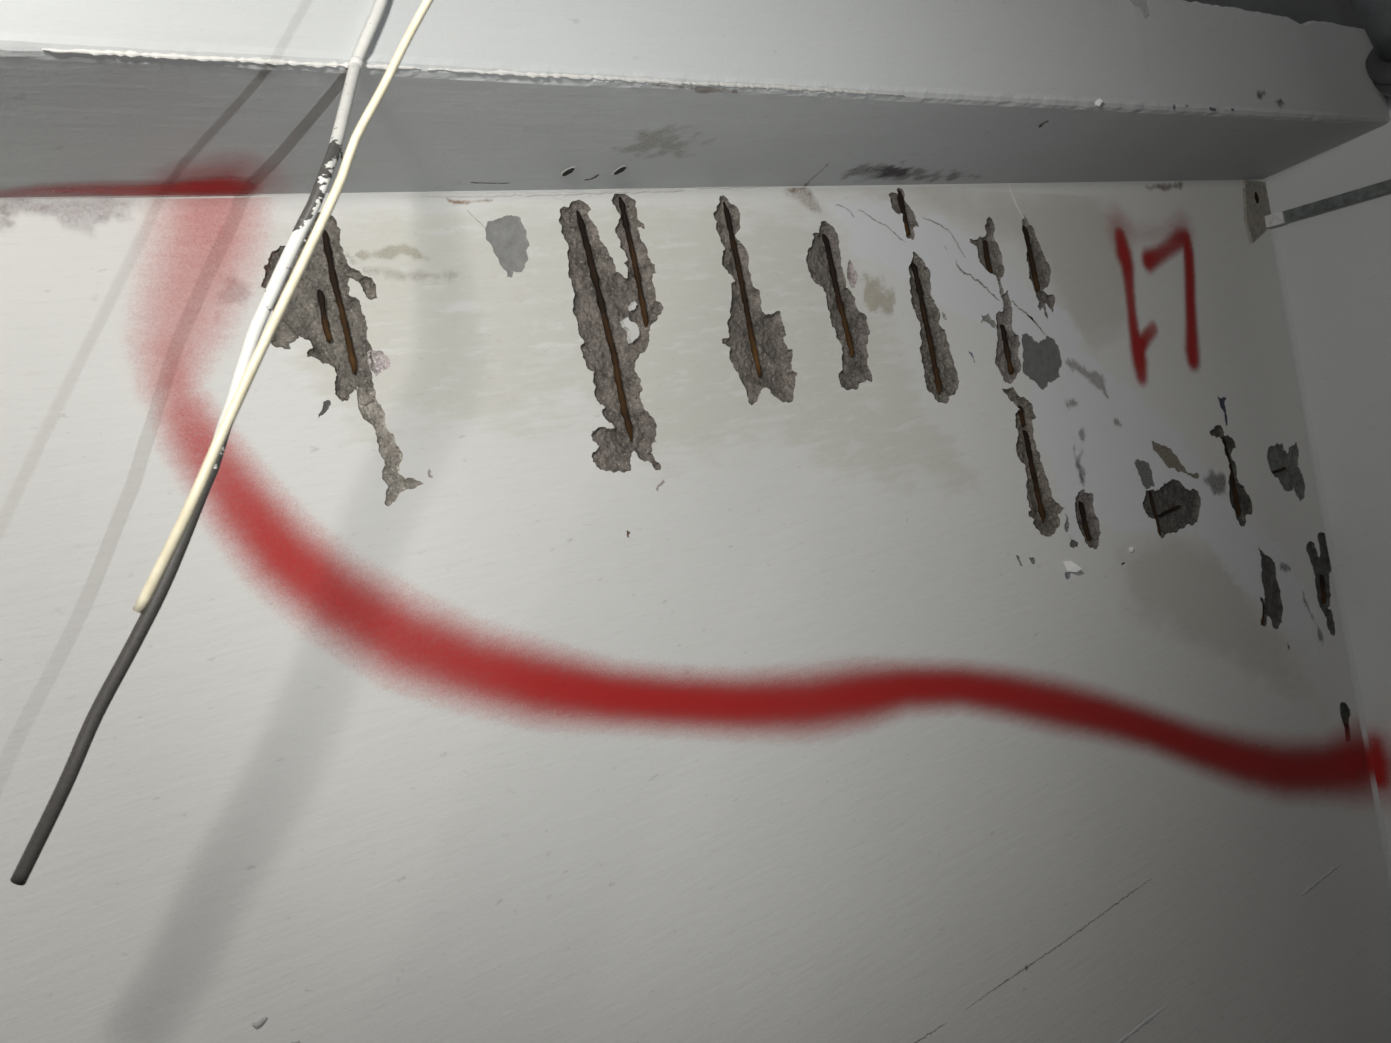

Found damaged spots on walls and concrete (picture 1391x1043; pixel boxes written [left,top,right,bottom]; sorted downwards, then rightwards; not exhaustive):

spalling [261,212,433,506]
spalling [559,194,665,491]
spalling [713,195,797,405]
spalling [806,221,873,390]
spalling [889,188,959,404]
spalling [970,216,1101,580]
spalling [1134,441,1201,539]
spalling [1210,397,1252,526]
spalling [1259,549,1283,629]
spalling [1306,532,1335,636]